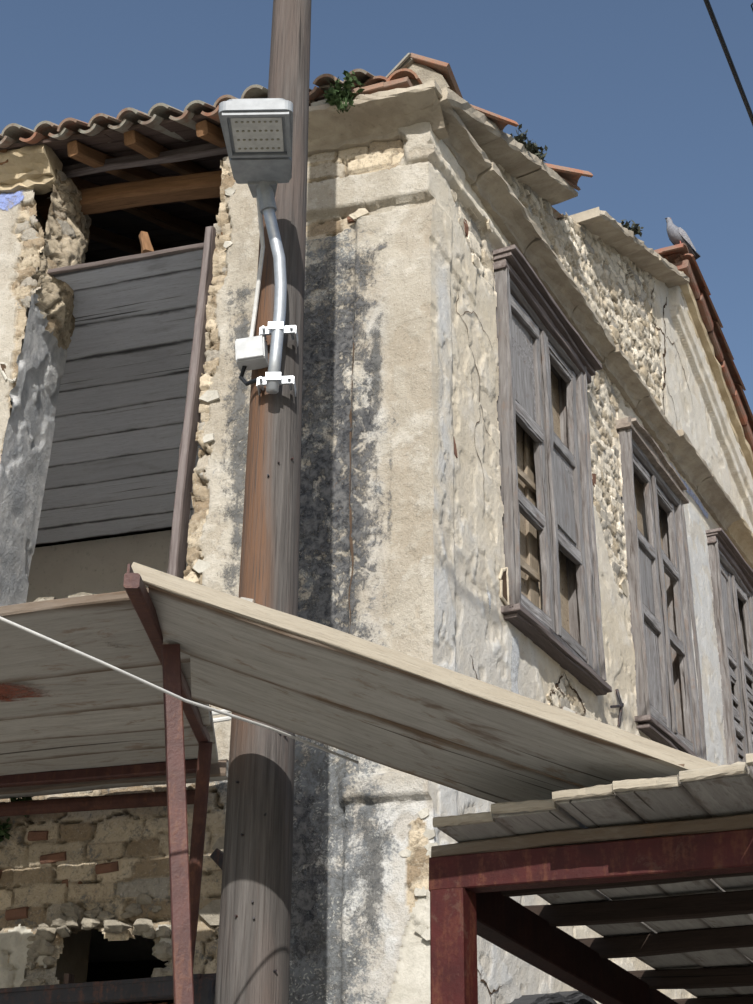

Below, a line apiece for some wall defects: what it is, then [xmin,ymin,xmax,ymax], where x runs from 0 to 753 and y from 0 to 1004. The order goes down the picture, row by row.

leakage [298,242,392,642]
crack [456,295,498,501]
crack [651,289,693,424]
flaking render [546,673,586,717]
flaking render [0,806,173,988]
flaking render [32,786,167,800]
flaking render [193,783,225,974]
leakage [290,785,333,966]
leakage [349,813,389,941]
flaking render [386,808,439,1004]
crack [477,969,504,1004]